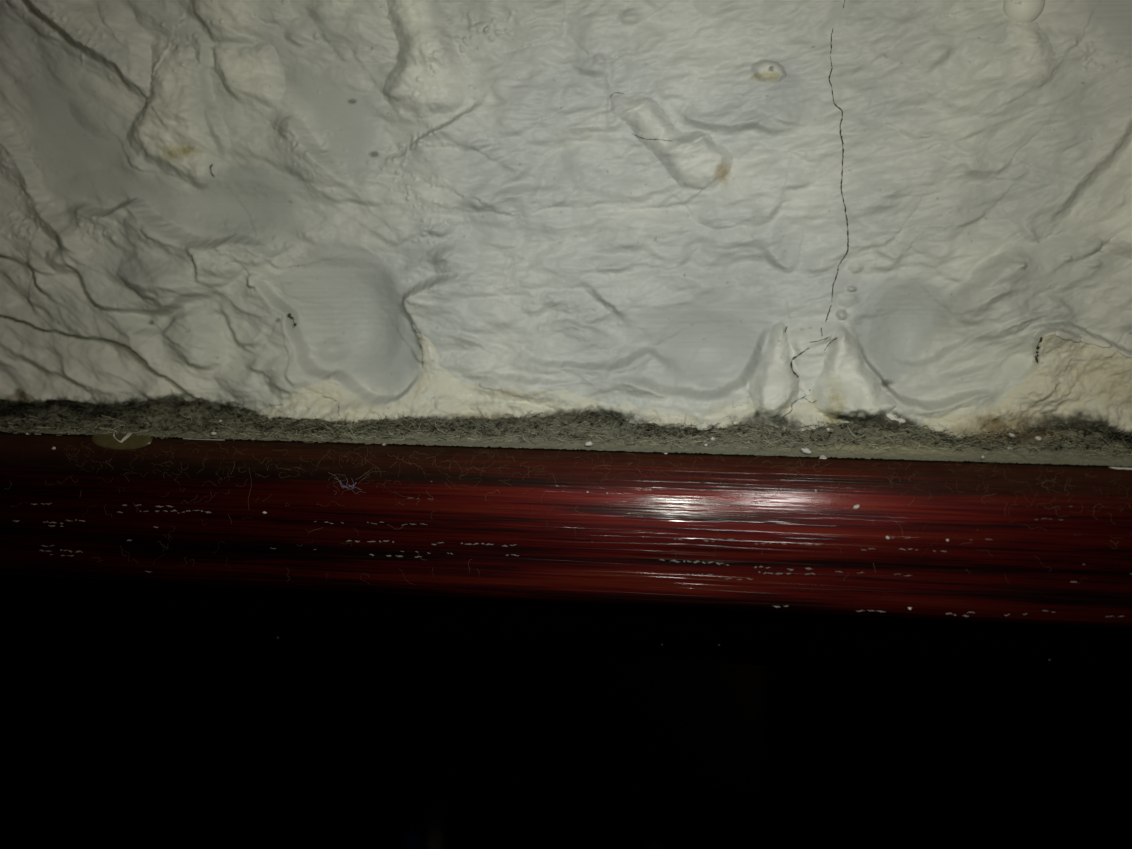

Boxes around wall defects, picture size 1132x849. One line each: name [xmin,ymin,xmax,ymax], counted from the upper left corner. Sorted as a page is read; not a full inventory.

crack [780,0,849,424]
leakage [979,412,1130,440]